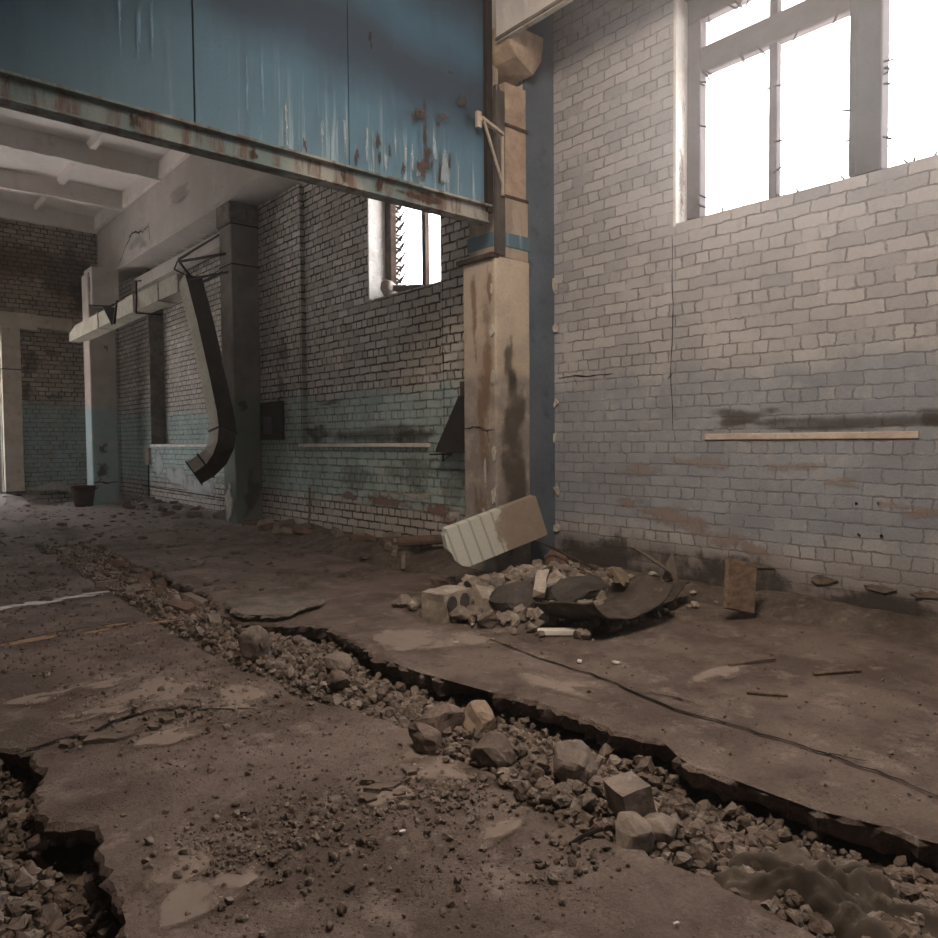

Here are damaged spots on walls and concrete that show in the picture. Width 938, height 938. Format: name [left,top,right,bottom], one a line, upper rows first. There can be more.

peeling [366,129,419,177]
peeling [433,129,459,195]
damp [0,243,87,312]
damp [503,347,526,502]
damp [720,410,759,426]
damp [770,408,938,430]
crack [490,639,938,797]